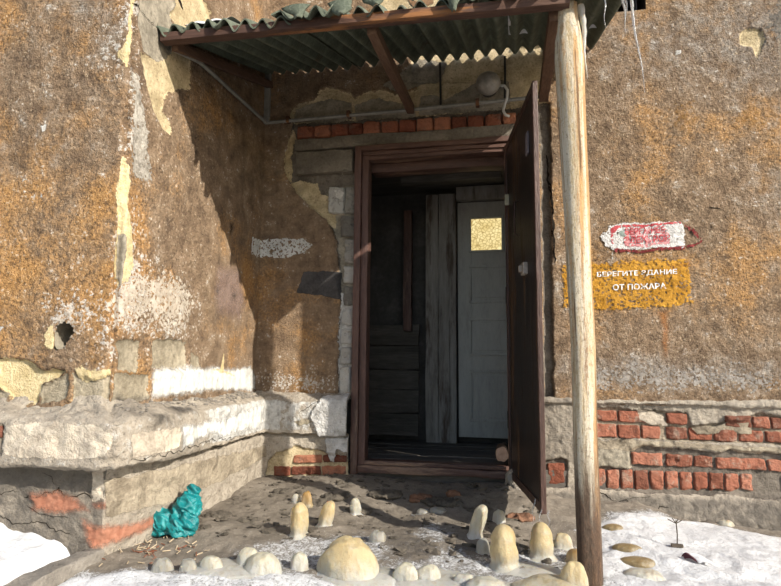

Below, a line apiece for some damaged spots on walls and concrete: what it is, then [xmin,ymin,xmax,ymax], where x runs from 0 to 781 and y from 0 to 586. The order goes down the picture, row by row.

flaking render [380,0,439,11]
flaking render [117,0,212,135]
flaking render [739,28,765,57]
spalling [114,156,134,286]
flaking render [284,46,555,399]
spalling [44,311,83,349]
peeling [0,338,255,405]
crack [0,473,91,535]
peeling [91,472,105,502]
flaking render [266,445,349,477]
flaking render [546,458,568,488]
flaking render [597,407,781,500]